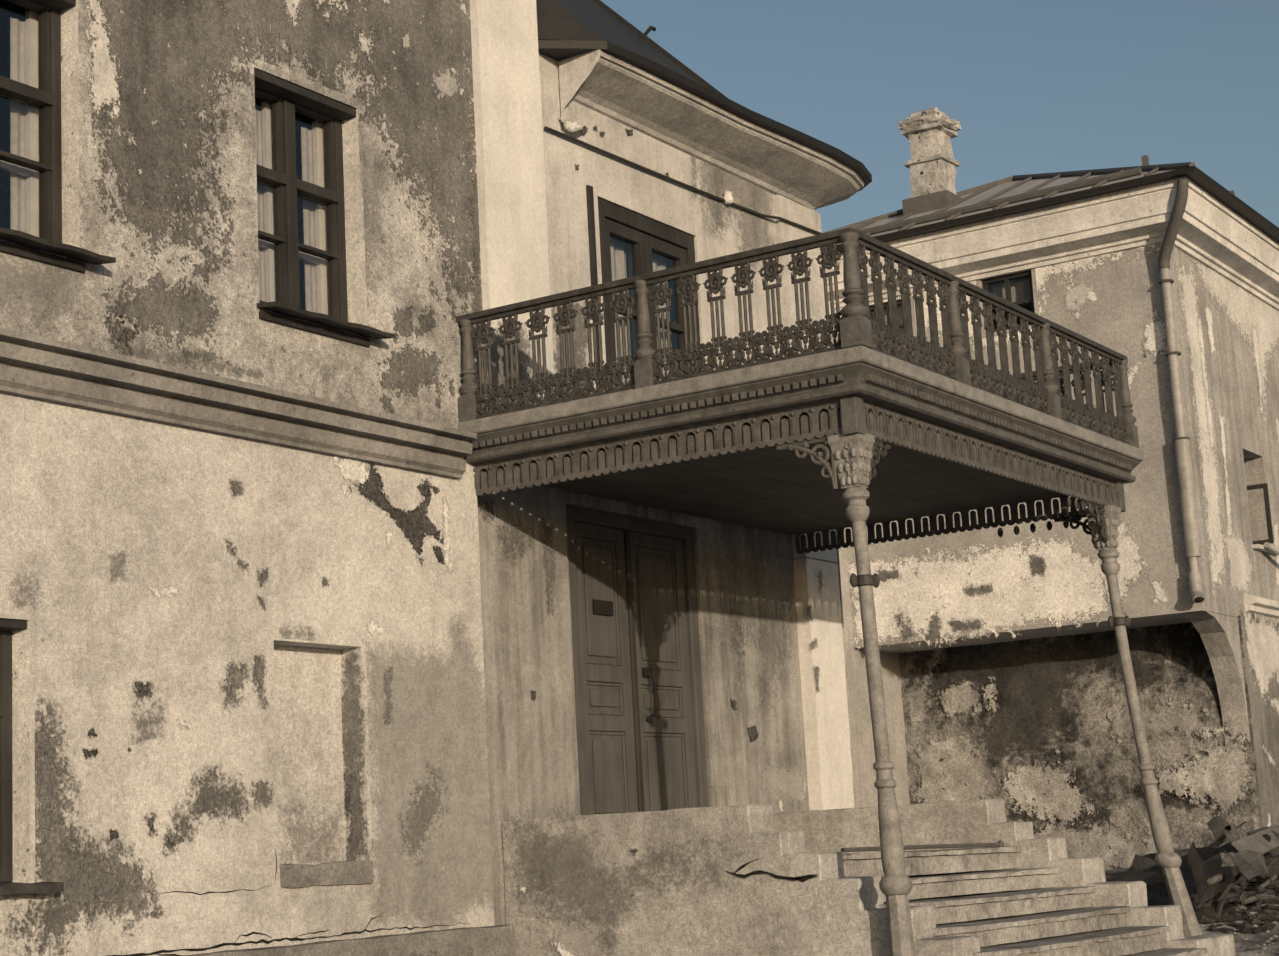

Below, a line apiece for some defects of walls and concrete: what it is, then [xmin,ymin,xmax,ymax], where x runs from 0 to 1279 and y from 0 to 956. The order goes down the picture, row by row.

peeling [83,0,121,118]
peeling [315,0,376,65]
peeling [869,288,945,340]
peeling [962,280,1033,351]
peeling [1035,242,1176,321]
damp [1176,257,1279,596]
spalling [333,455,454,572]
peeling [847,518,1167,649]
peeling [1241,608,1279,716]
spalling [82,726,98,759]
crack [726,859,818,882]
crack [108,914,470,956]